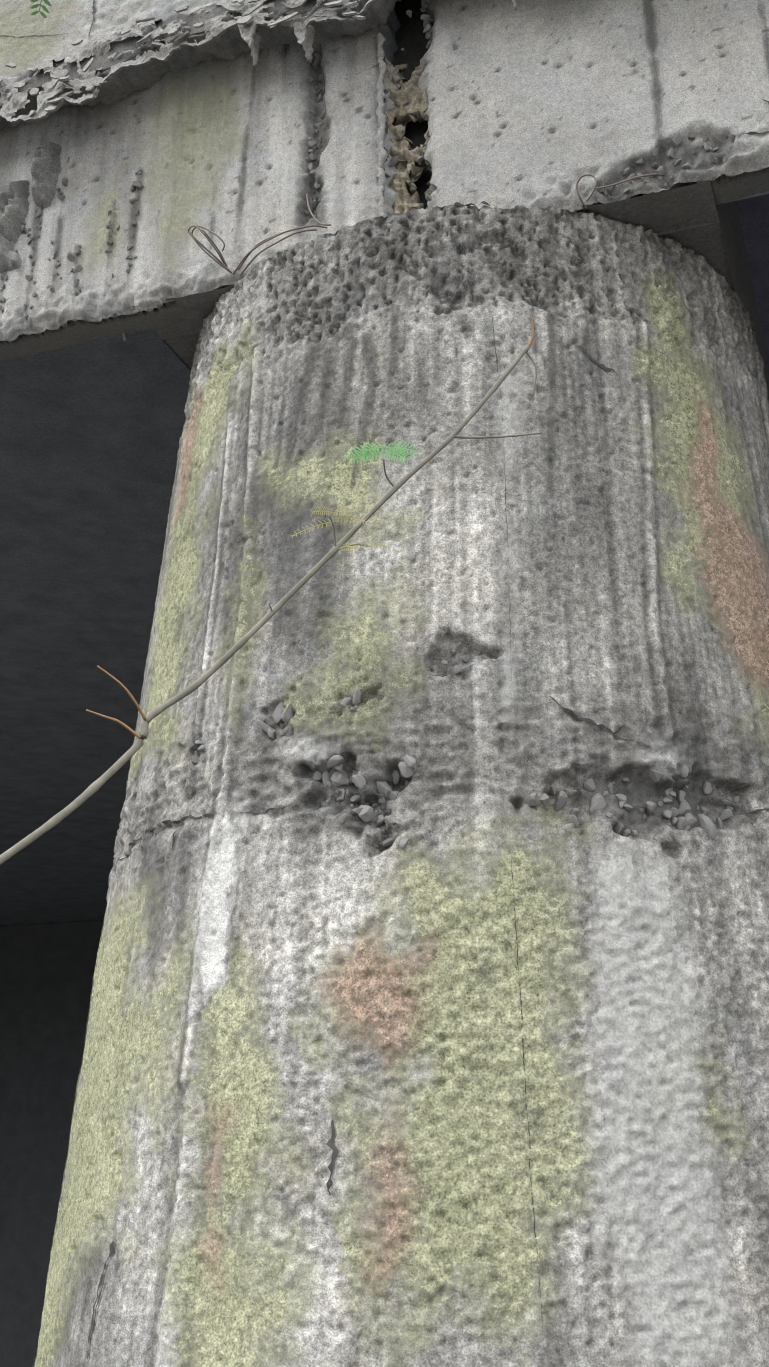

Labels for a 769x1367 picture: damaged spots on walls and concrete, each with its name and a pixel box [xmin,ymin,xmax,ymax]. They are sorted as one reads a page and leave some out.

leakage [32,204,40,261]
leakage [107,171,140,259]
flaking render [0,0,377,226]
crack [378,44,389,196]
spalling [596,132,735,198]
crack [579,345,618,376]
crack [492,318,512,699]
rust [690,407,769,680]
crack [550,696,661,757]
rust [332,944,413,1049]
crack [511,857,543,1330]
crack [326,1120,339,1195]